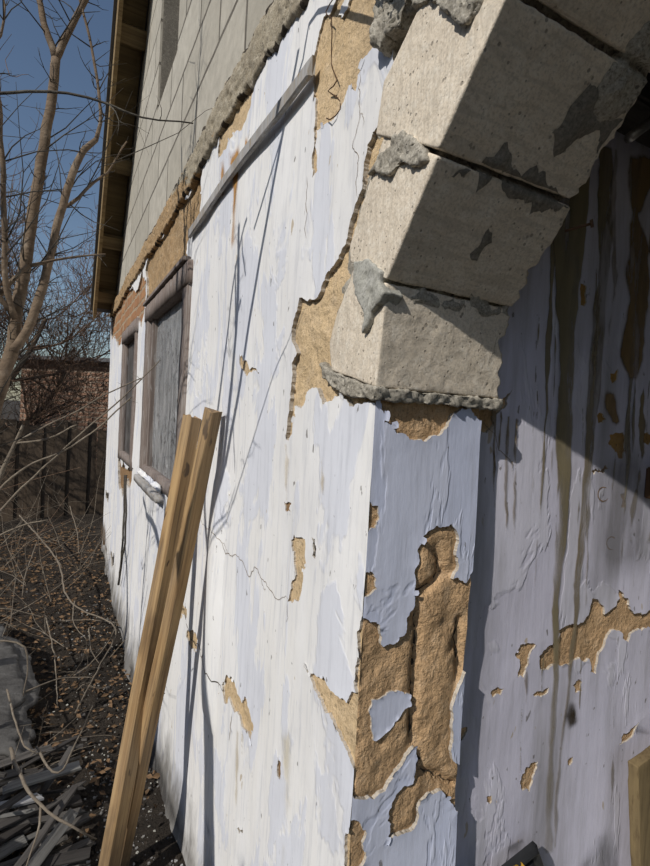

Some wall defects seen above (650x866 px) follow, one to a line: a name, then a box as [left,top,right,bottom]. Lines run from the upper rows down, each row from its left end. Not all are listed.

peeling [312,0,376,178]
flaking render [285,128,512,442]
leakage [492,410,518,525]
leakage [535,147,650,727]
crack [201,521,288,617]
peeling [288,536,315,603]
peeling [217,675,253,746]
flaking render [304,524,471,846]
peeling [515,590,650,678]
flaking render [343,820,367,866]